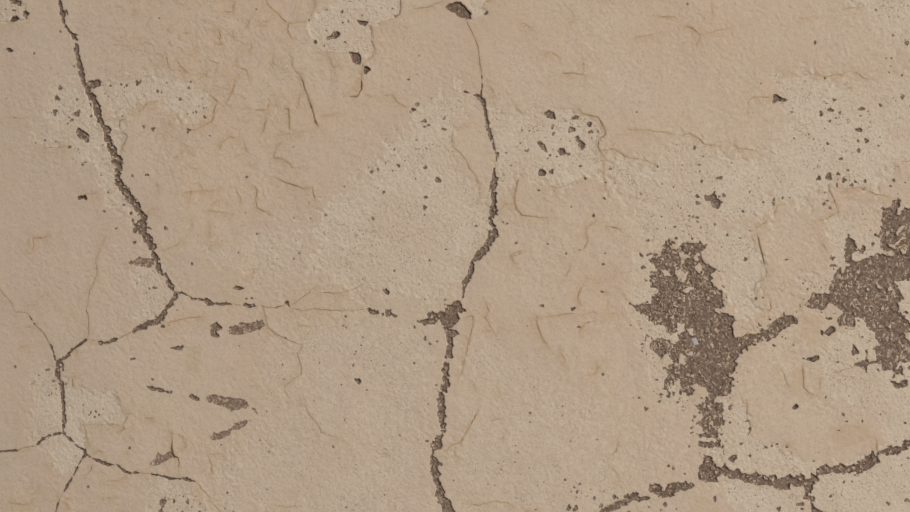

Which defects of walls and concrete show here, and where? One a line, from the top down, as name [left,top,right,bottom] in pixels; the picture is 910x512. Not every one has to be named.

peeling [0,0,34,30]
crack [166,0,443,214]
crack [0,0,397,512]
peeling [178,194,335,310]
crack [420,0,545,512]
peeling [285,0,910,512]
peeling [136,297,811,512]